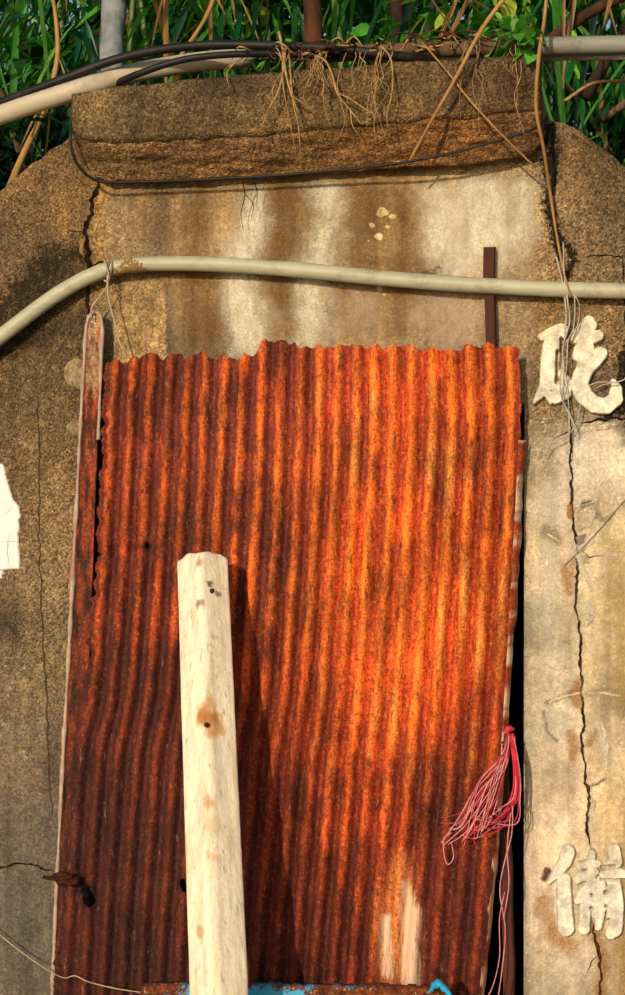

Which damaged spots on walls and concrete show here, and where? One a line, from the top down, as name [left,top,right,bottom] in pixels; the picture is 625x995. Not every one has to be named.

crack [71,183,107,323]
crack [587,254,625,322]
water stain [602,332,625,427]
crack [554,397,625,848]
crack [0,862,52,871]
crack [587,921,603,995]